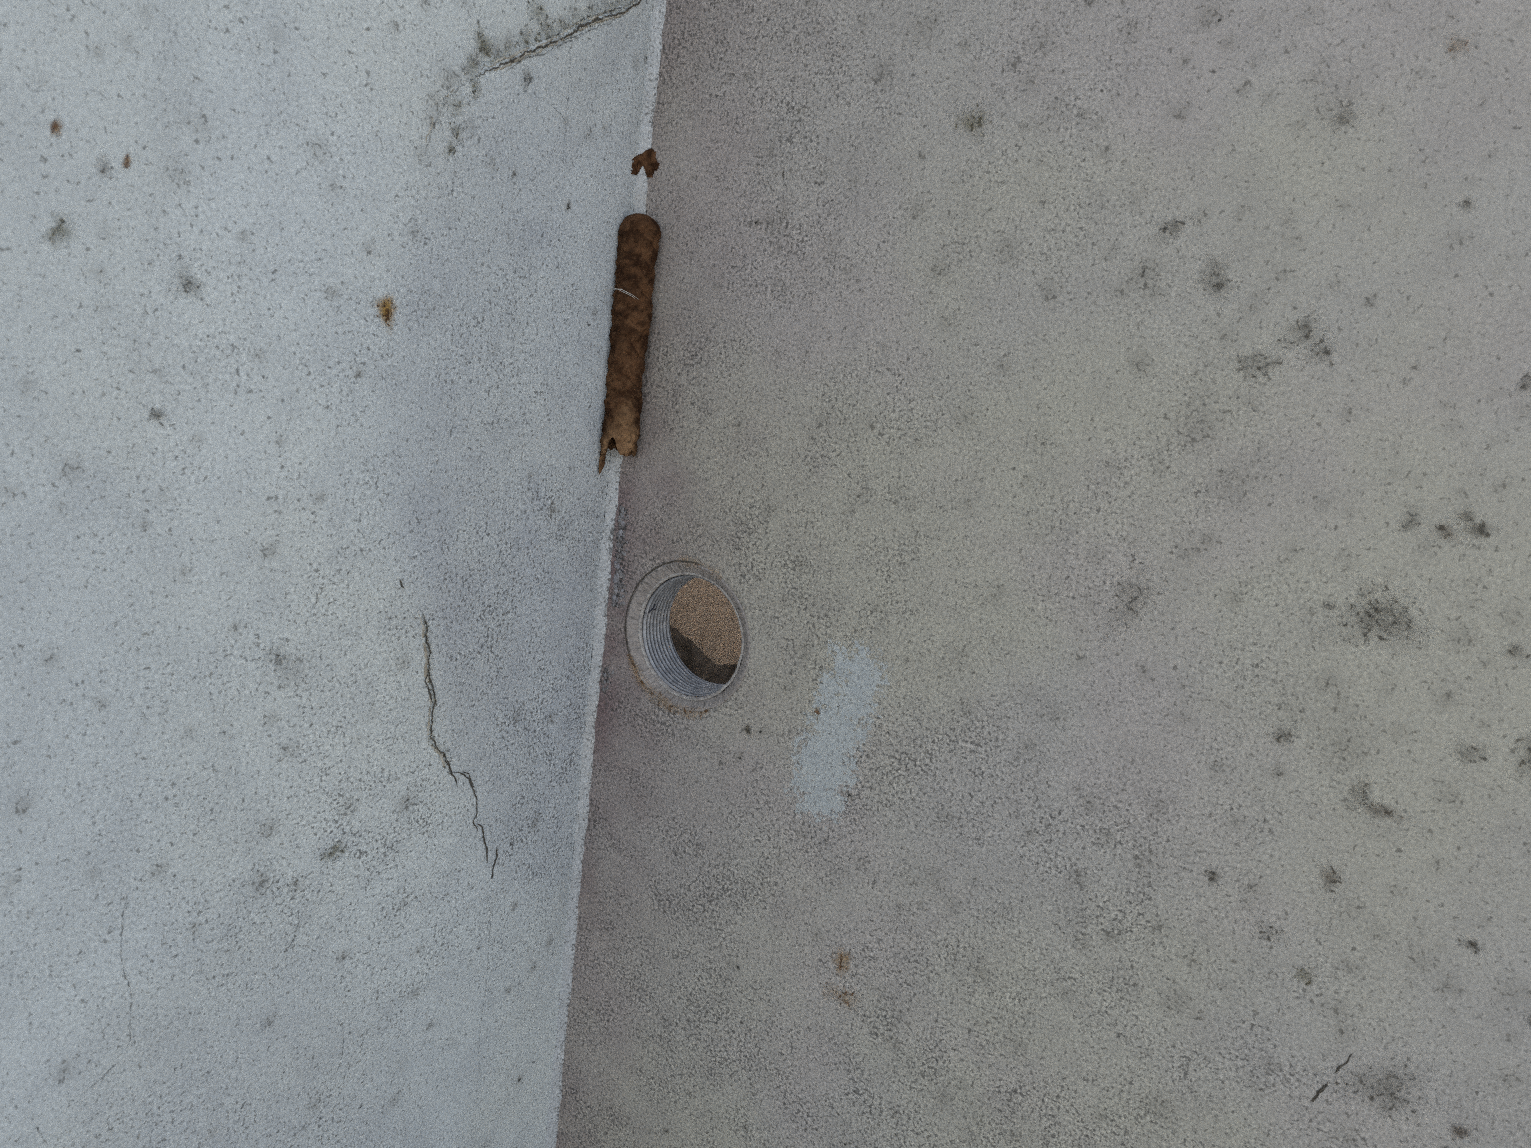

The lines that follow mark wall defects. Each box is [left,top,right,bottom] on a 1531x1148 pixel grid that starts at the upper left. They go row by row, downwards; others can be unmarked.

crack [425,0,642,155]
crack [400,580,498,878]